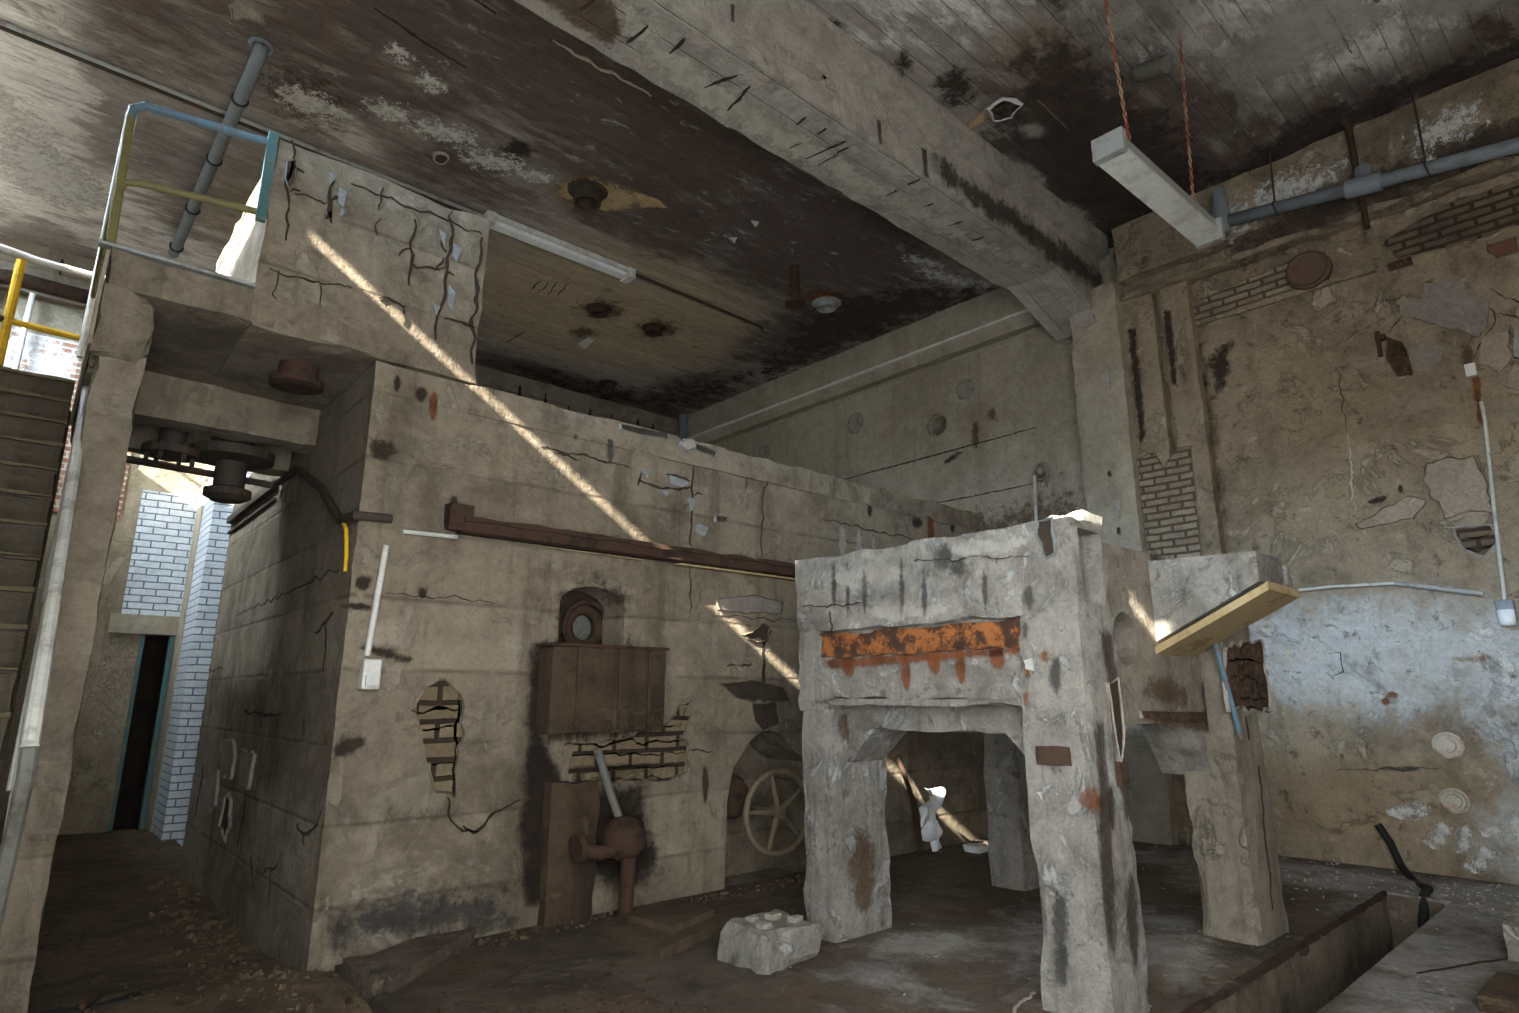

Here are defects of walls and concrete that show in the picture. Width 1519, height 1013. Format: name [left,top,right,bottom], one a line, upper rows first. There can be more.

spalling [228,0,267,25]
damp [1210,0,1519,269]
crack [269,140,525,364]
crack [531,280,569,296]
flaking render [1193,259,1294,321]
flaking render [1381,179,1519,273]
crack [518,386,654,430]
flaking render [1136,445,1202,559]
flaking render [1355,455,1504,559]
rust [826,648,1029,703]
flaking render [414,676,465,798]